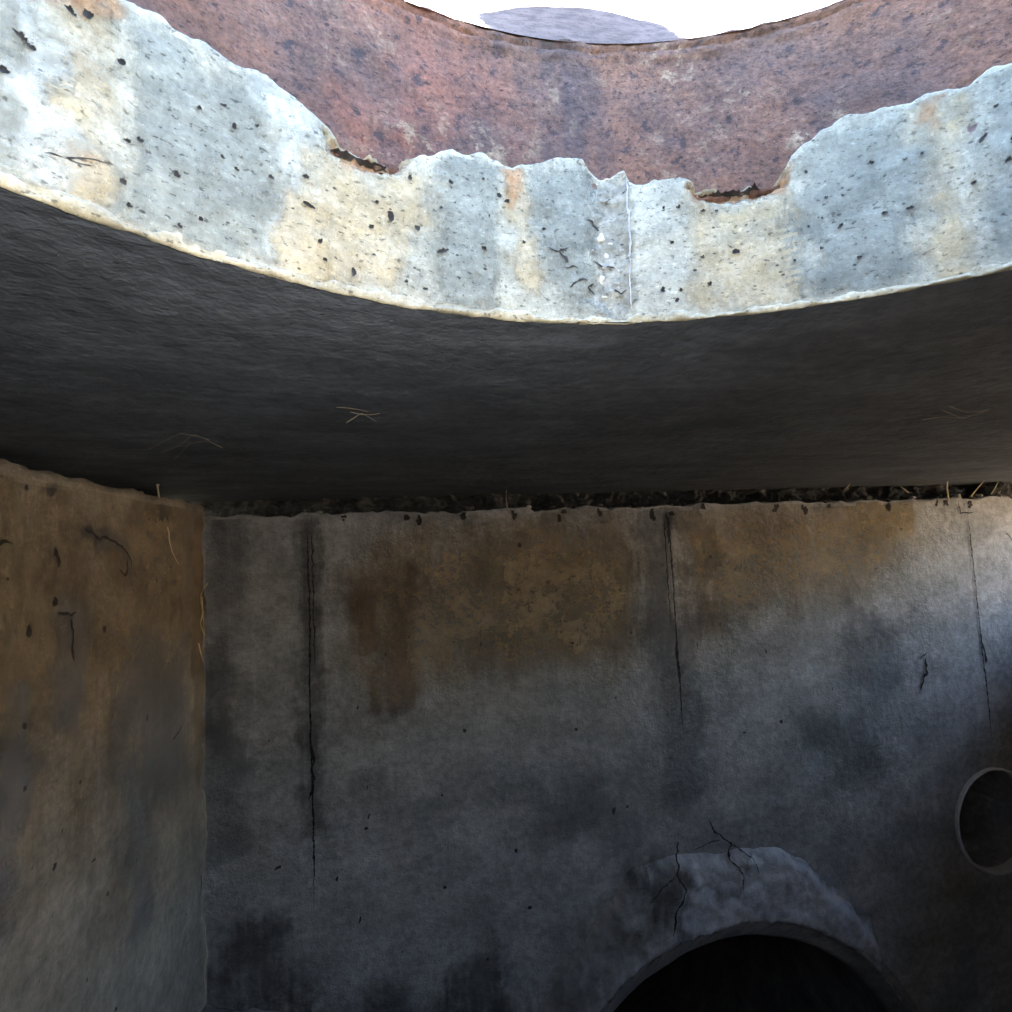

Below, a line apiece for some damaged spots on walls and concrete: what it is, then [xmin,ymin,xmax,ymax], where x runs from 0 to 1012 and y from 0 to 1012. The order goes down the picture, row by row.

crack [53,547,61,567]
crack [58,612,76,662]
crack [663,512,684,738]
crack [295,521,323,910]
crack [648,820,759,937]